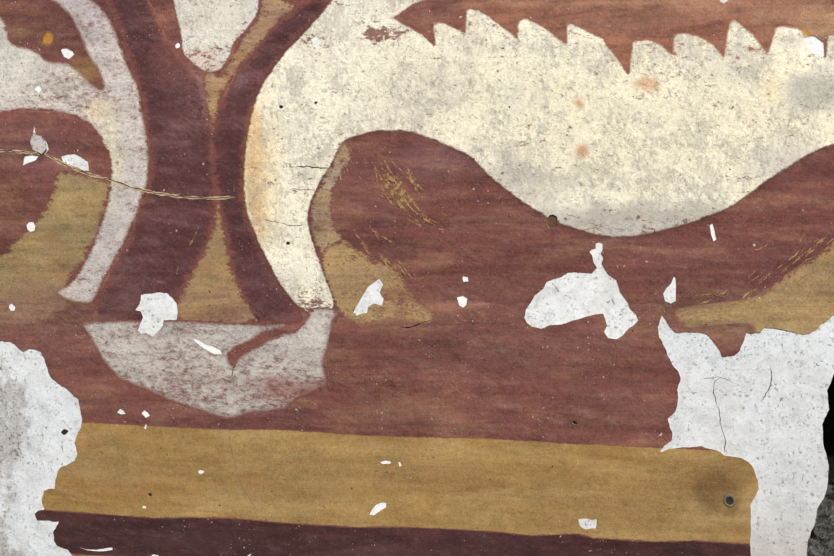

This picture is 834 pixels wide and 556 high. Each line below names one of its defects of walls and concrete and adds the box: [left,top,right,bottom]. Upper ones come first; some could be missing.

peeling [136,292,178,336]
peeling [354,279,384,315]
peeling [524,242,638,339]
peeling [663,277,676,303]
peeling [0,340,82,556]
peeling [658,315,834,556]